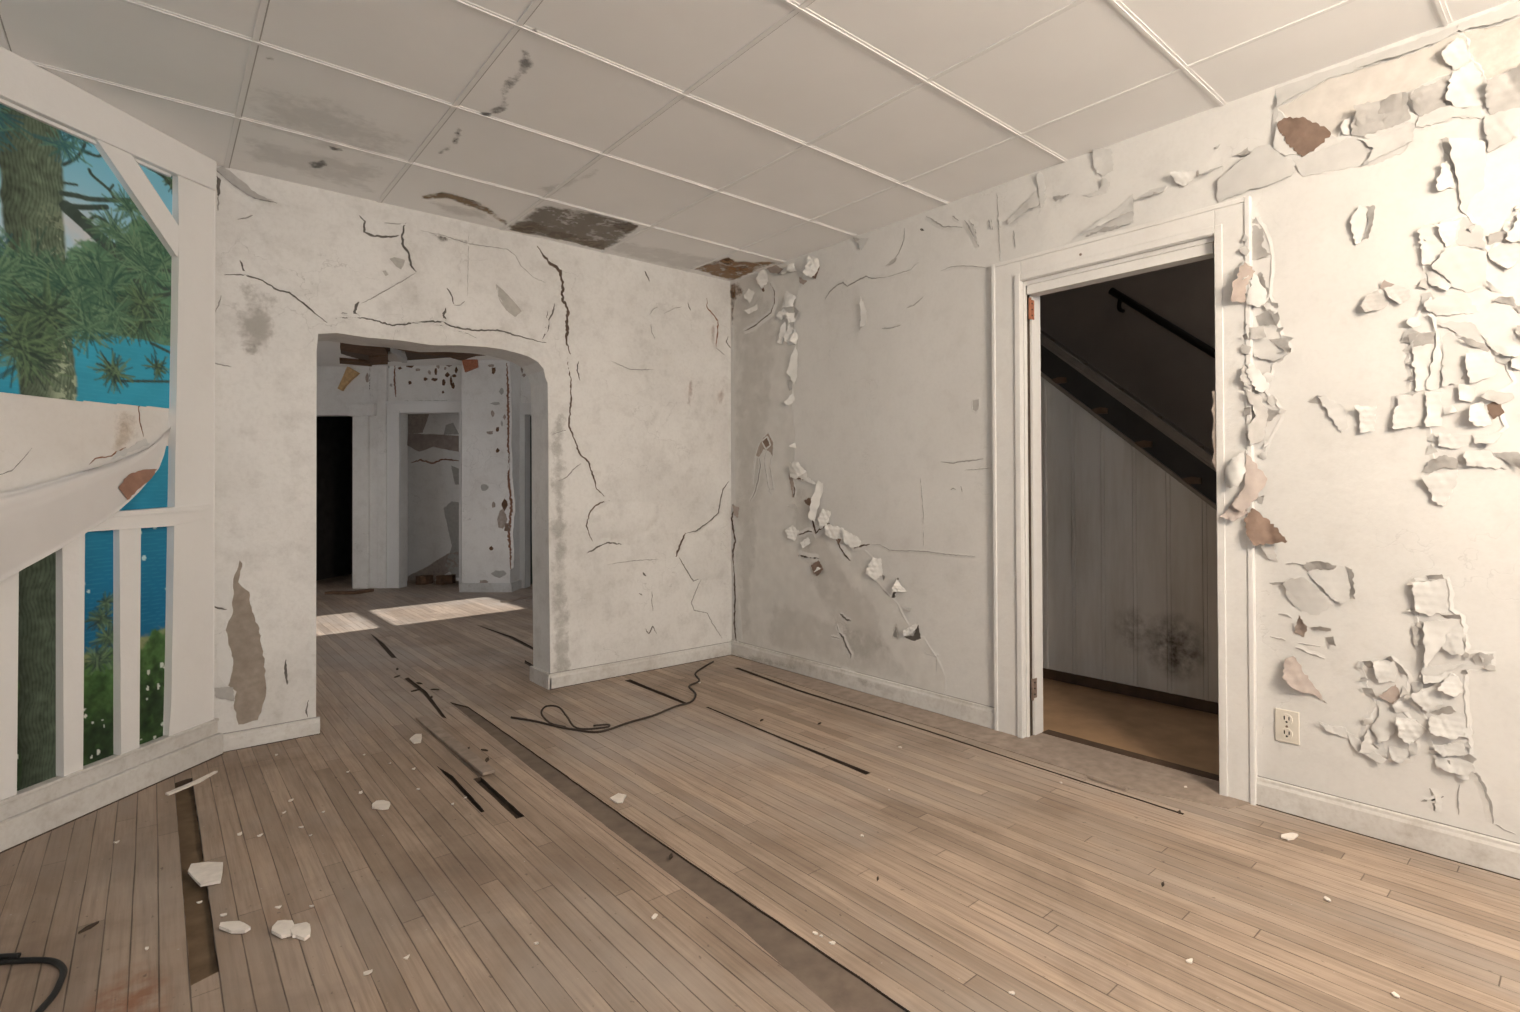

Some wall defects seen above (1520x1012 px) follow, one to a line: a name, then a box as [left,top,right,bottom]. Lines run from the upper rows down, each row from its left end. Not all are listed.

crack [216,166,278,223]
peeling [1080,0,1520,506]
peeling [386,347,526,583]
crack [215,214,743,642]
flaking render [732,255,947,695]
peeling [1220,216,1355,702]
flaking render [214,559,270,727]
peeling [1319,574,1497,780]
crack [1418,764,1516,835]